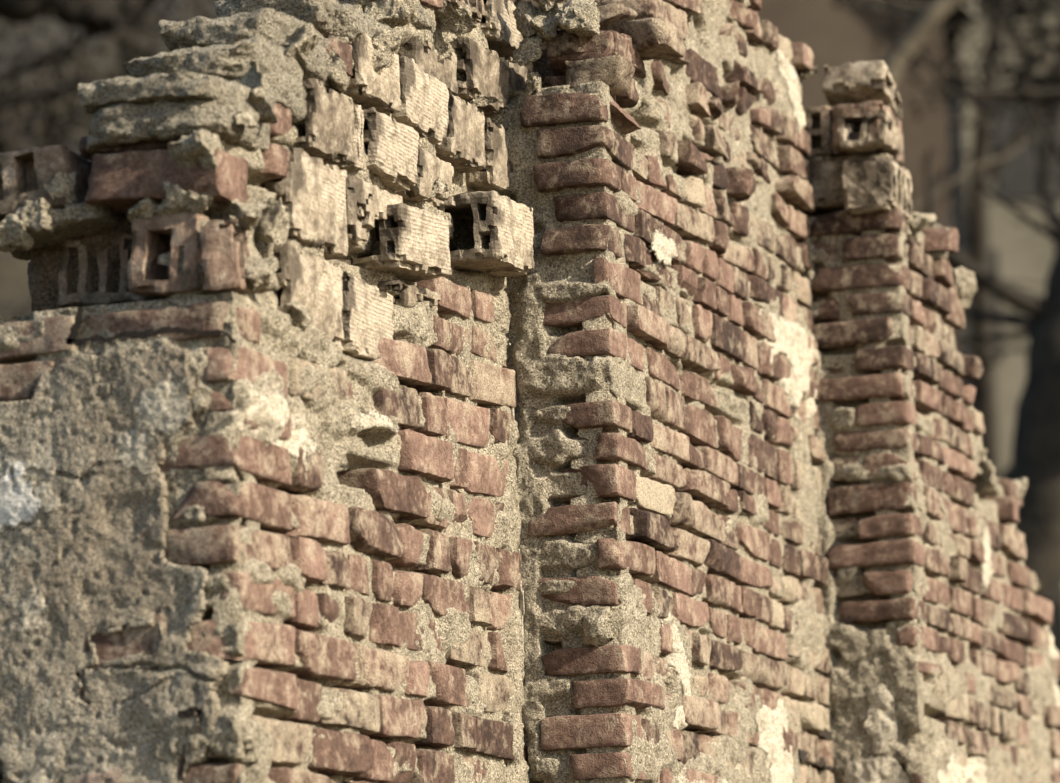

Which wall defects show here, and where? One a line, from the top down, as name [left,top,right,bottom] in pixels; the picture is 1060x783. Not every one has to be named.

peeling [759,309,819,421]
crack [51,461,101,481]
spalling [76,613,167,705]
crack [94,665,223,704]
crack [177,706,205,774]
peeling [842,684,910,783]